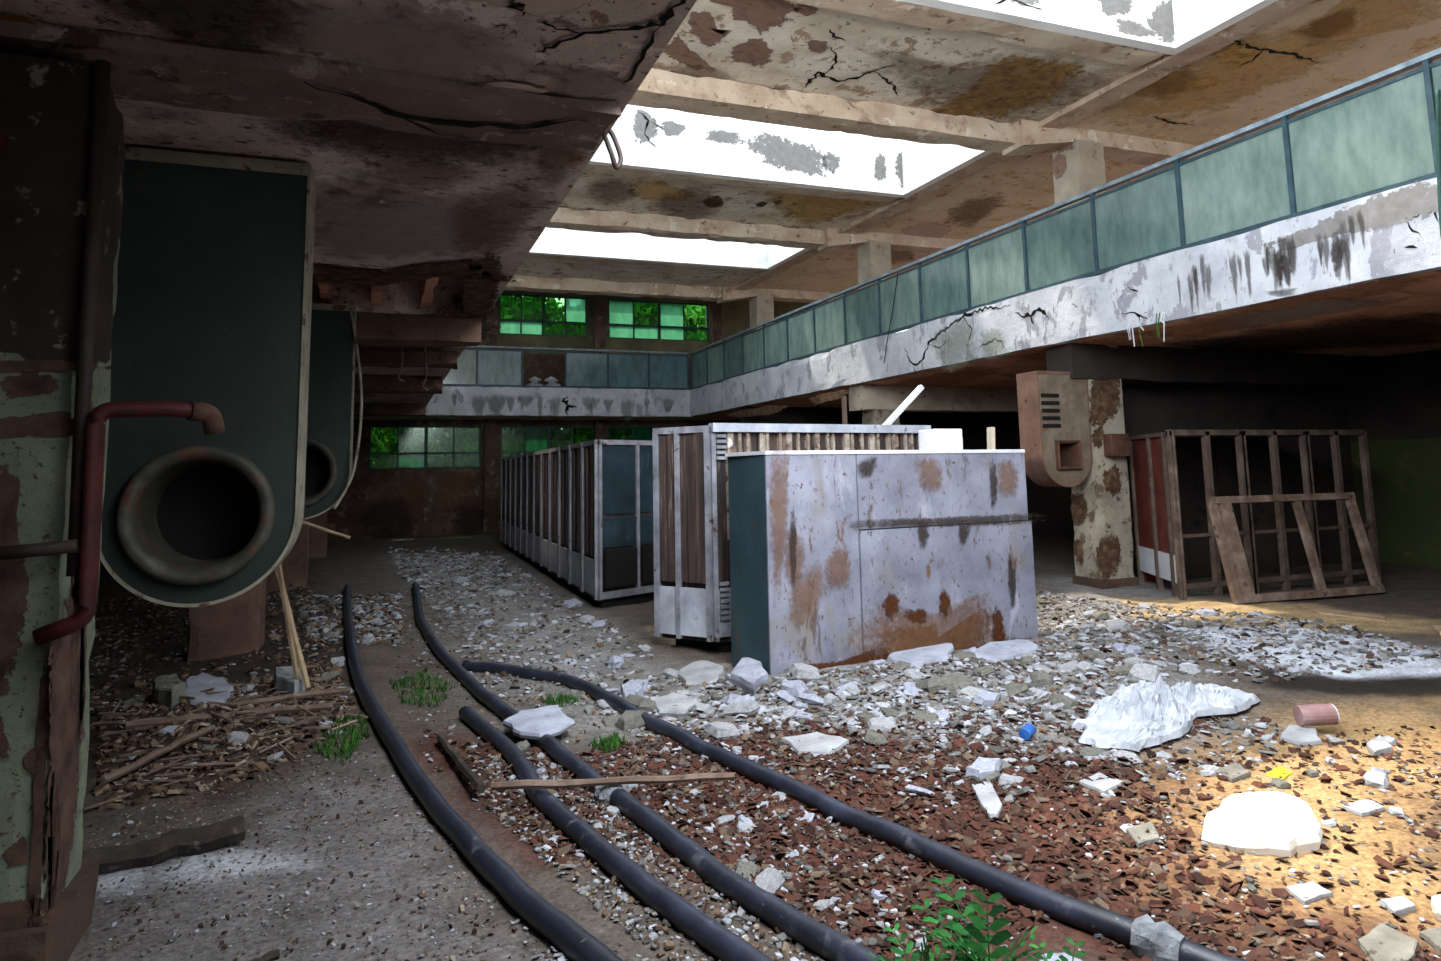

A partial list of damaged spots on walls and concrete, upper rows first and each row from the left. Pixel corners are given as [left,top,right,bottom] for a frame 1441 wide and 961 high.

crack [506,0,686,147]
leakage [667,66,724,78]
crack [801,30,898,96]
leakage [880,54,1101,119]
leakage [1317,213,1364,276]
spalling [312,246,523,342]
crack [1121,286,1148,319]
leakage [1166,240,1441,353]
crack [904,304,1077,374]
peeling [0,360,113,411]
peeling [0,411,74,696]
peeling [0,576,87,932]